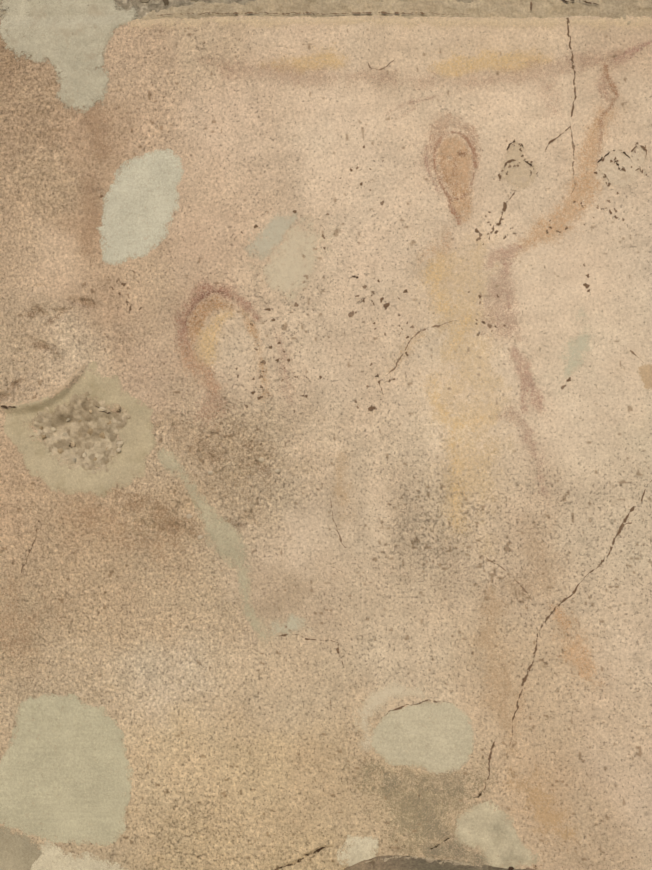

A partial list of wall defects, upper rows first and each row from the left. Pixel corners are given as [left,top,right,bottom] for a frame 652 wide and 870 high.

crack [545,0,599,194]
spalling [19,281,142,360]
crack [474,480,652,798]
crack [275,847,325,870]